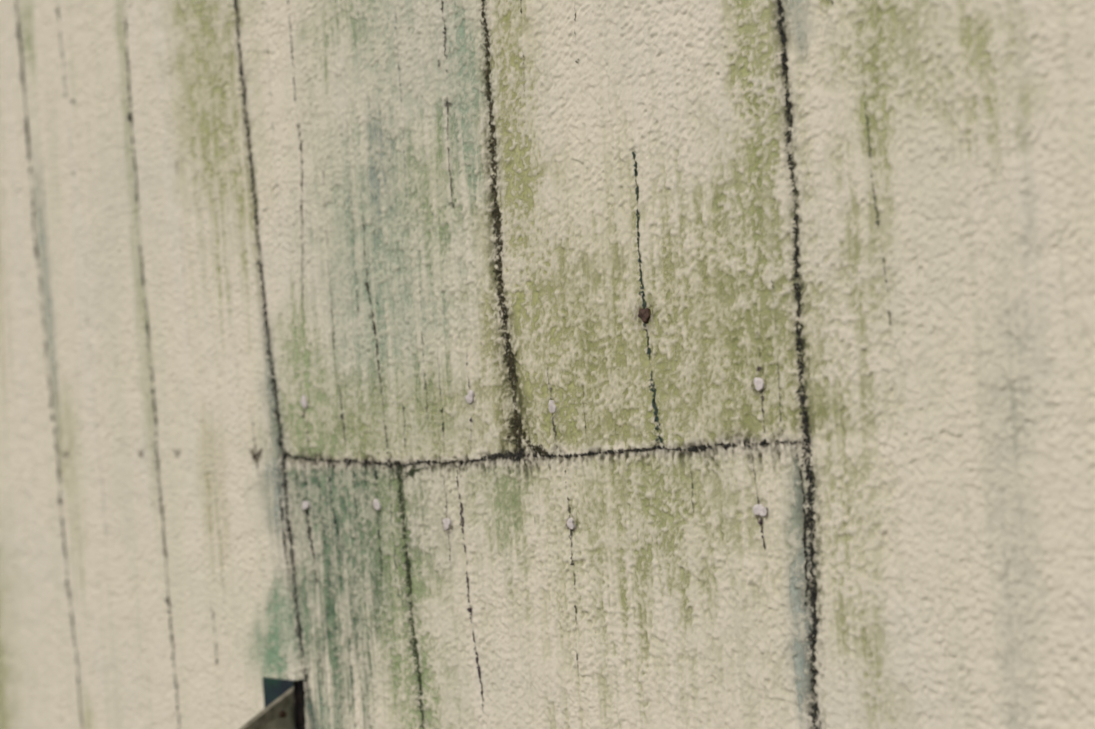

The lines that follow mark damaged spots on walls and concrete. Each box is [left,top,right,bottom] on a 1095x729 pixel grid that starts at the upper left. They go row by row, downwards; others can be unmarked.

crack [14,1,82,729]
crack [124,1,139,220]
crack [138,247,180,725]
crack [233,0,819,729]
rust [638,308,652,324]
damp [790,460,812,711]